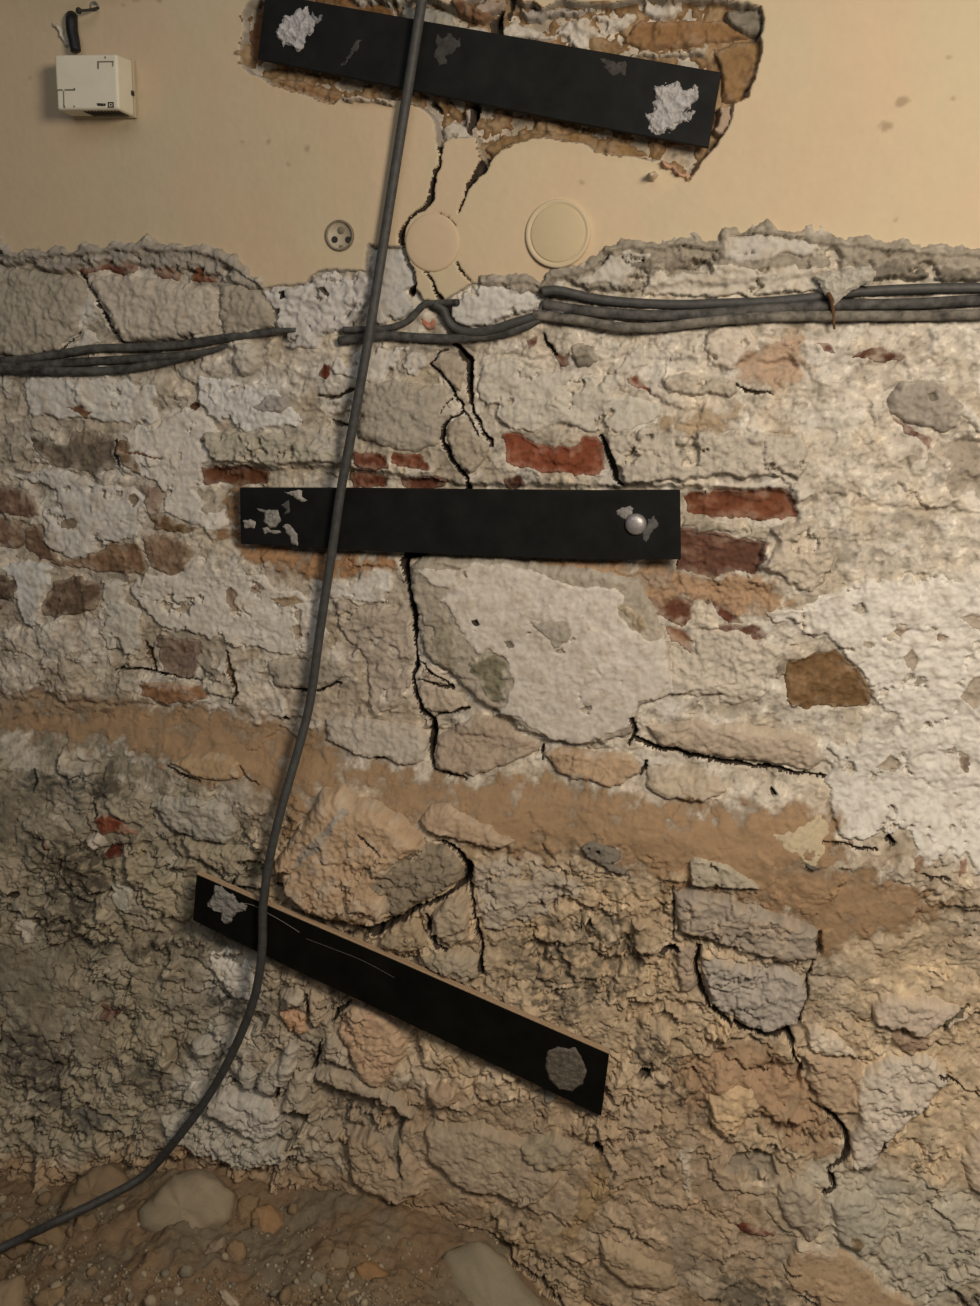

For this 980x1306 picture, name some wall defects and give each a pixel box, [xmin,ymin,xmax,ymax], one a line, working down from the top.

spalling [236,0,765,182]
spalling [0,233,435,350]
crack [398,102,491,299]
spalling [451,218,980,328]
crack [429,343,494,489]
peeling [0,375,468,714]
flaking render [676,487,798,579]
crack [399,552,471,781]
crack [627,717,827,797]
peeling [649,572,980,876]
crack [360,839,486,976]
crack [637,886,822,1075]